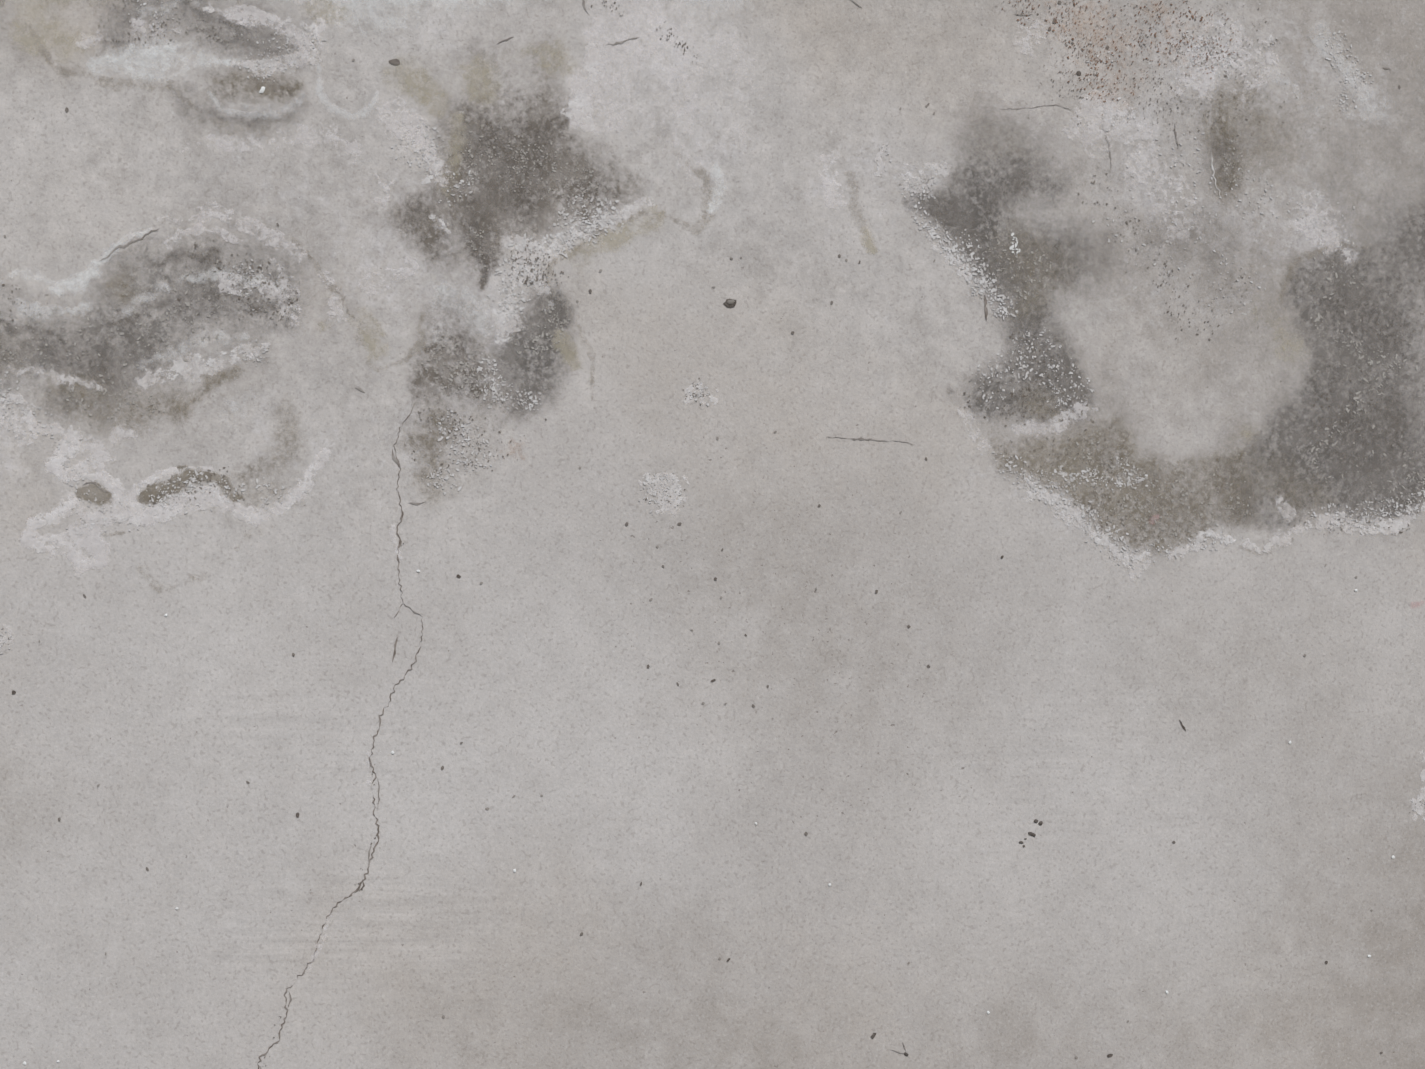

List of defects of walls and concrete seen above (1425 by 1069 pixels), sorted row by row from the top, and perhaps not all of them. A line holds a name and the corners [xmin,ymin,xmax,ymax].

damp [0,0,723,577]
damp [820,20,1425,580]
crack [257,404,424,1069]